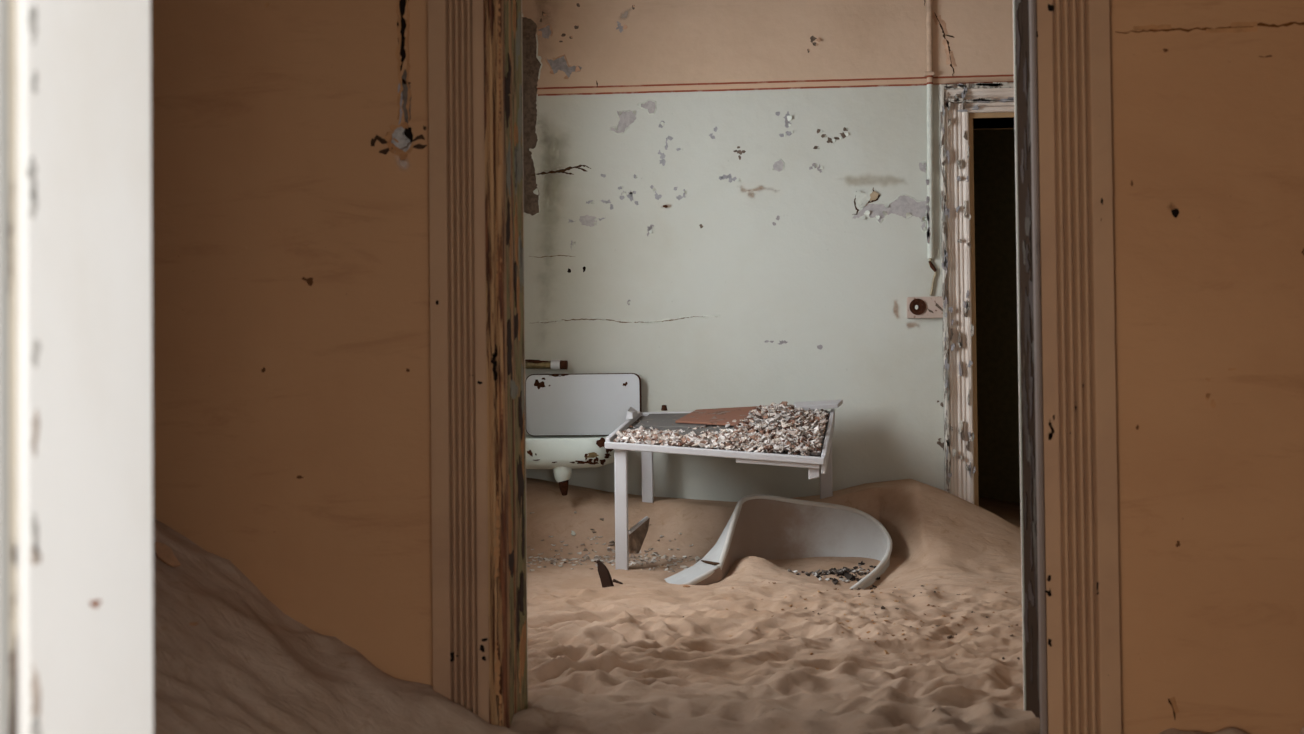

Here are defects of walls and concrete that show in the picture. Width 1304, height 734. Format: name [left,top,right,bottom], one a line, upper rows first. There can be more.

crack [395,0,411,124]
crack [924,0,957,75]
crack [1115,21,1304,34]
crack [532,165,591,176]
peeling [569,174,687,227]
peeling [610,99,683,166]
peeling [775,111,794,137]
peeling [809,127,848,173]
peeling [472,0,582,693]
peeling [852,0,1071,700]